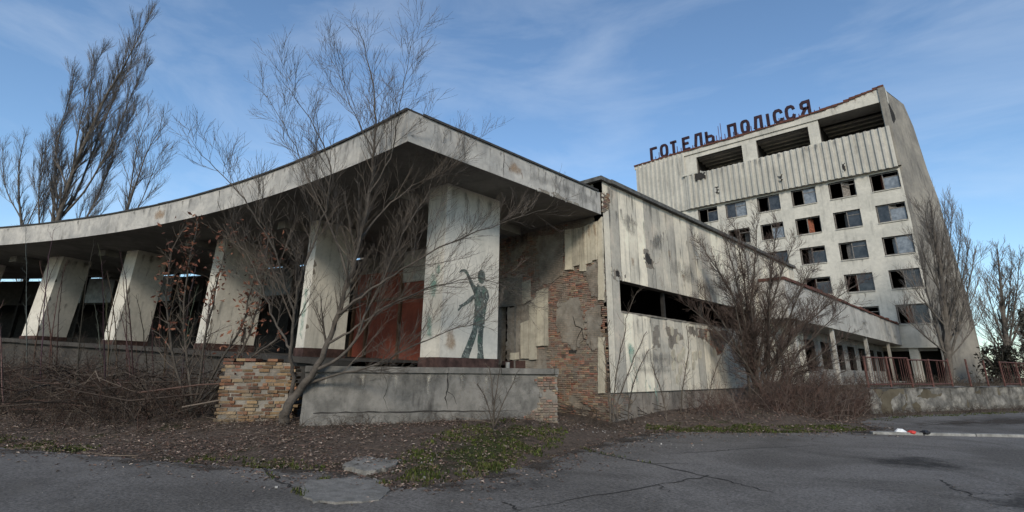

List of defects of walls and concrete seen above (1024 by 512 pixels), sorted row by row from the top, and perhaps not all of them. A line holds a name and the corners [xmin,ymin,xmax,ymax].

flaking render [498,224,634,424]
crack [502,444,833,511]